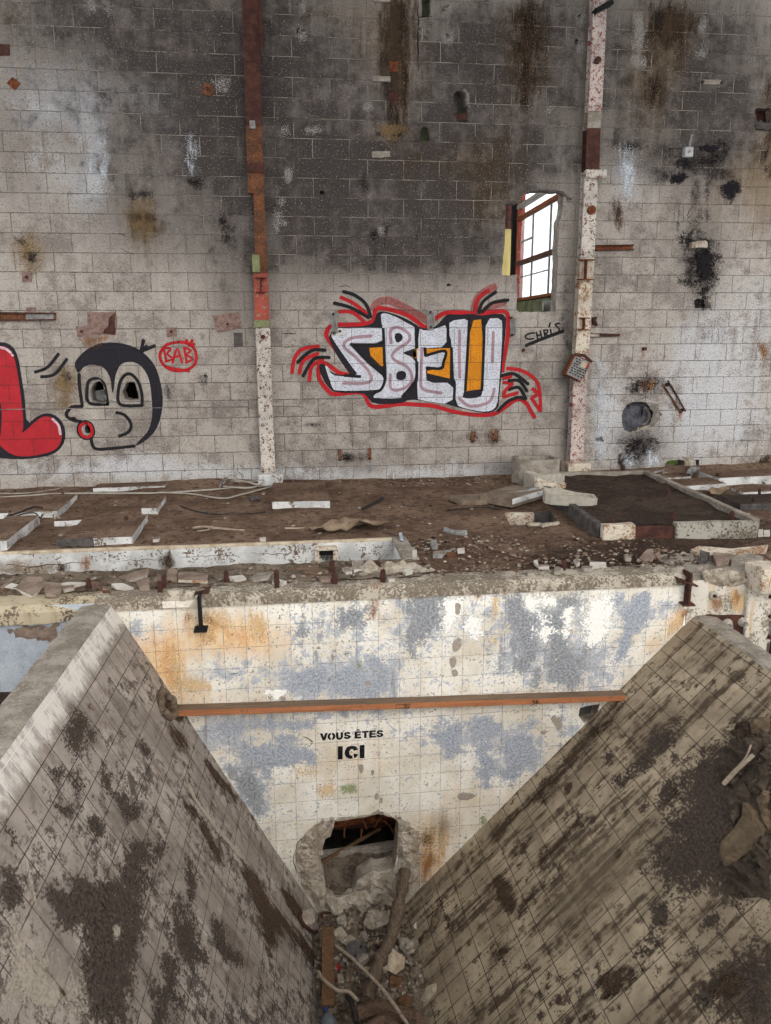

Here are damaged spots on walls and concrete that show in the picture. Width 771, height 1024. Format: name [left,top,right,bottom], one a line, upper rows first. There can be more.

leakage [645,0,698,52]
leakage [379,0,420,134]
leakage [510,0,550,109]
leakage [15,237,37,272]
spalling [632,402,662,433]
leakage [595,425,659,467]
peeling [7,623,60,643]
spalling [295,793,424,934]
corrosion [422,835,445,879]